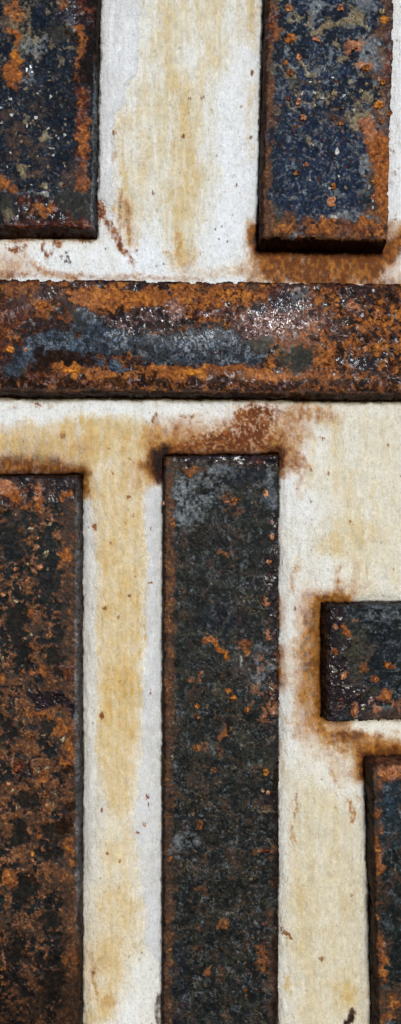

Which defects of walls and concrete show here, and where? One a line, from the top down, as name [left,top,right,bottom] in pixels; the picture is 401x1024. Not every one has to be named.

corrosion [0,0,401,423]
corrosion [0,415,110,1024]
corrosion [138,402,306,1024]
corrosion [295,570,401,1024]